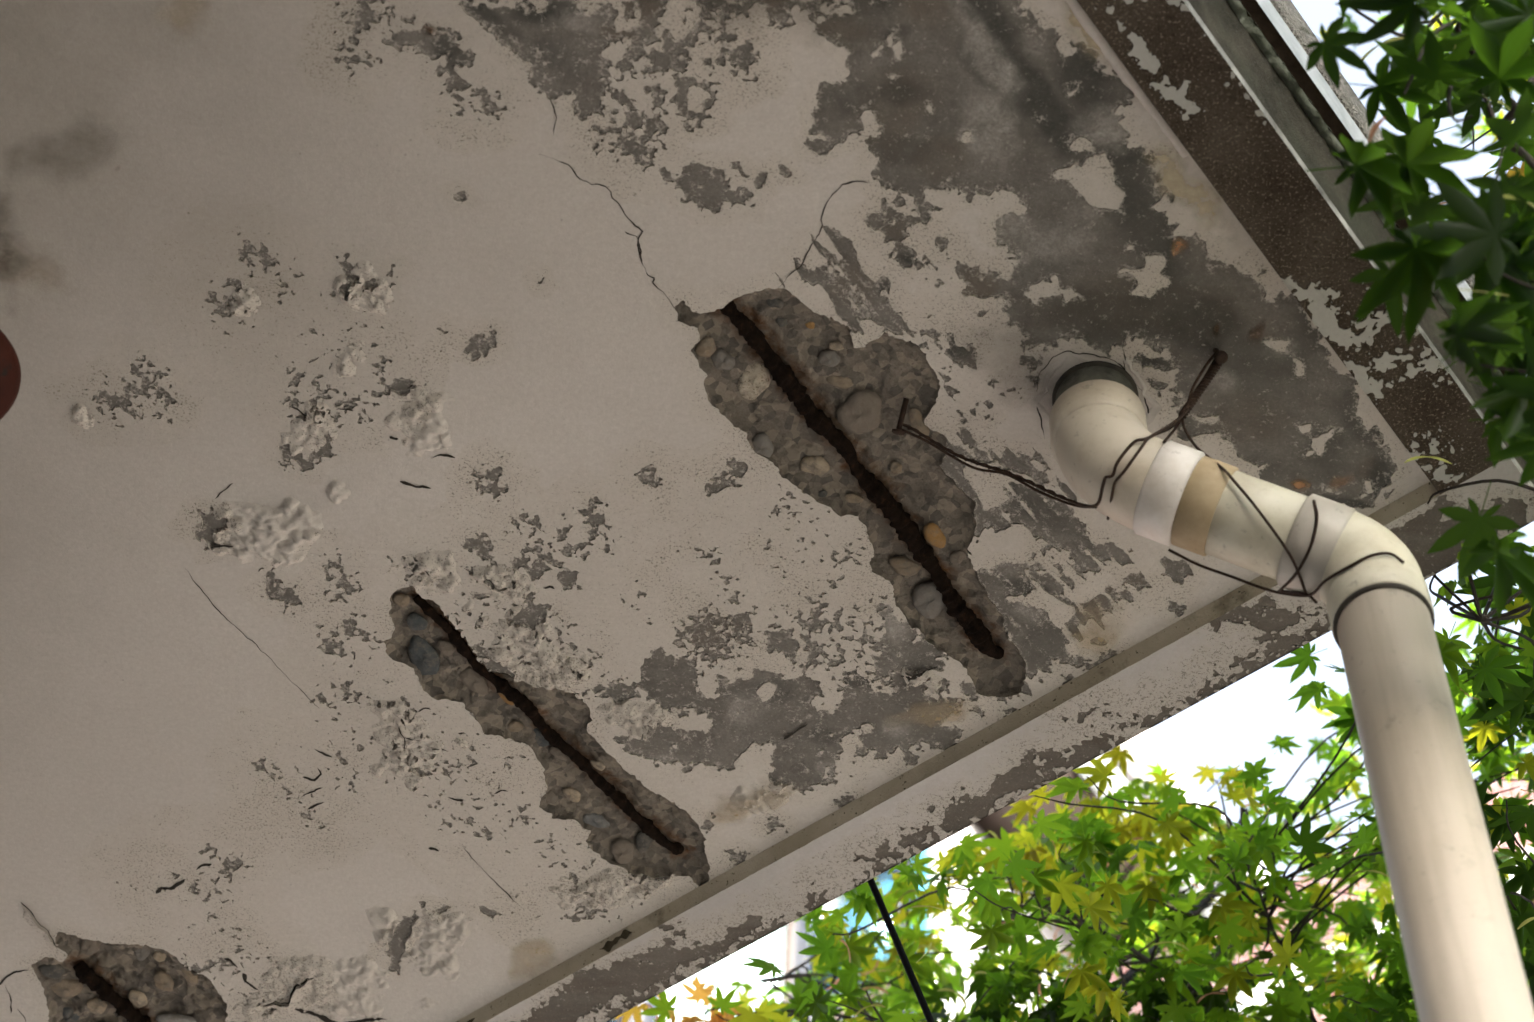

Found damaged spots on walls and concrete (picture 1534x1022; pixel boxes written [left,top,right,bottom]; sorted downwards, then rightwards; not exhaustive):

crack [539,97,674,307]
crack [783,181,870,283]
peeling [92,355,182,426]
peeling [278,322,426,471]
spalling [310,0,1532,886]
peeling [258,567,302,613]
peeling [251,758,325,828]
peeling [512,595,1330,1022]
spalling [31,843,282,1022]
peeling [386,901,450,974]
peeling [479,906,501,917]
crack [224,958,387,1022]